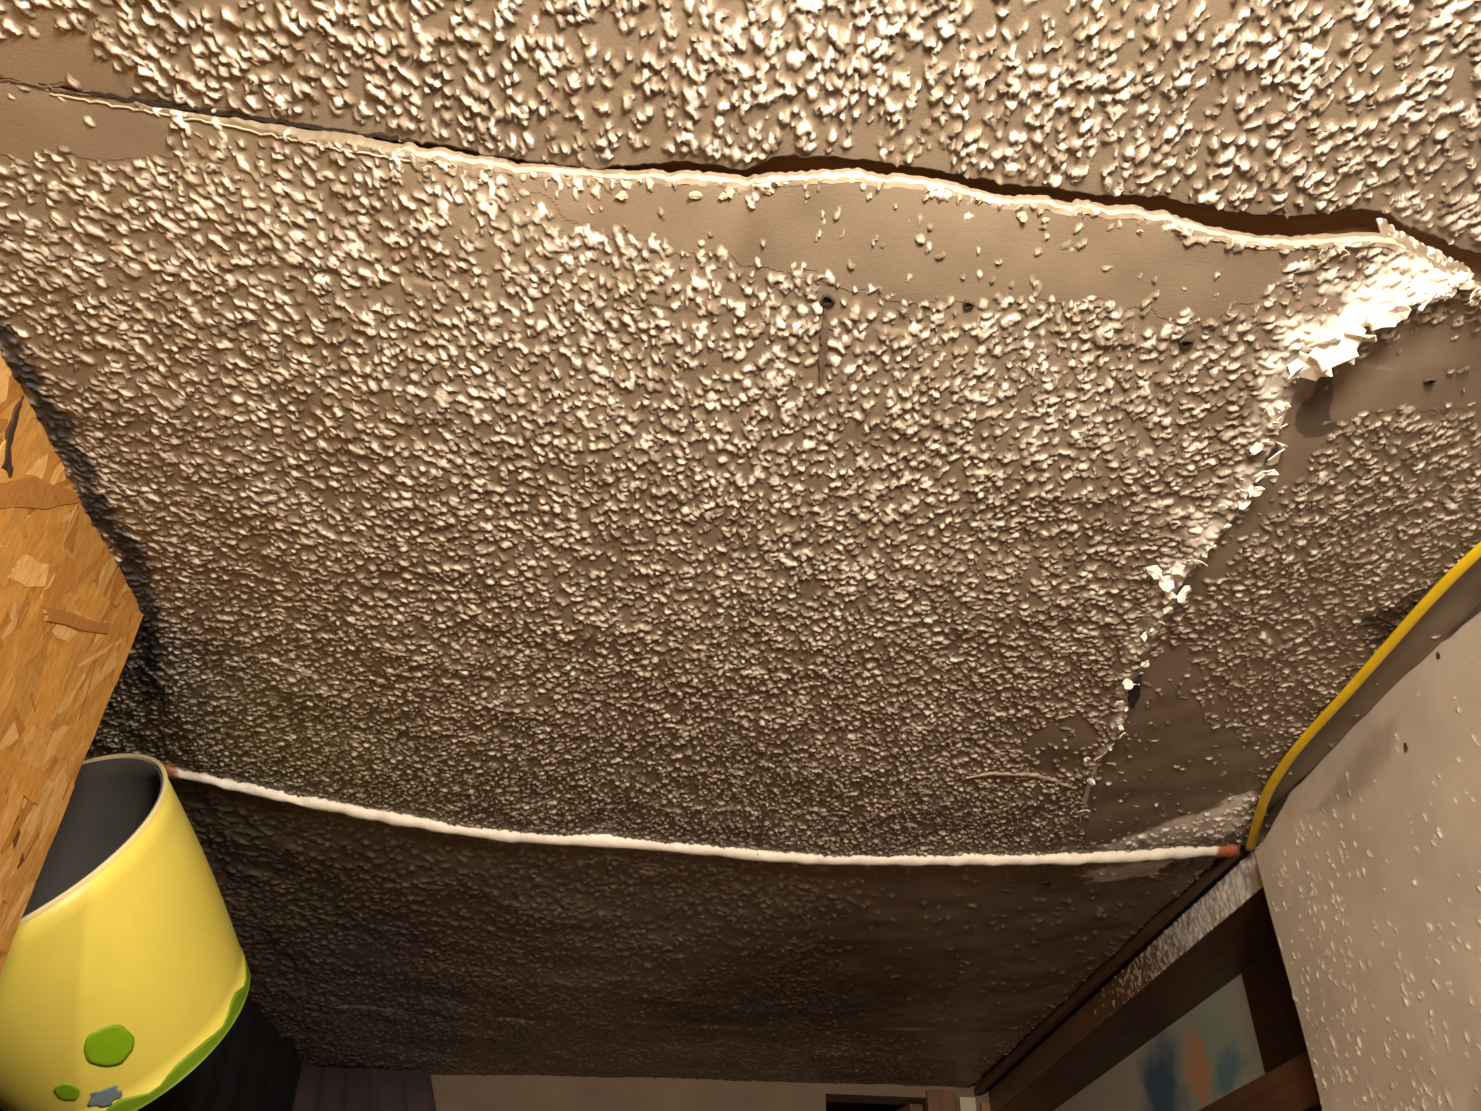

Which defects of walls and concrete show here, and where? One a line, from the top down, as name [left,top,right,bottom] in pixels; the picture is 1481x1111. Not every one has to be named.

crack [0,79,1406,261]
spalling [1146,290,1481,603]
spalling [1016,639,1268,845]